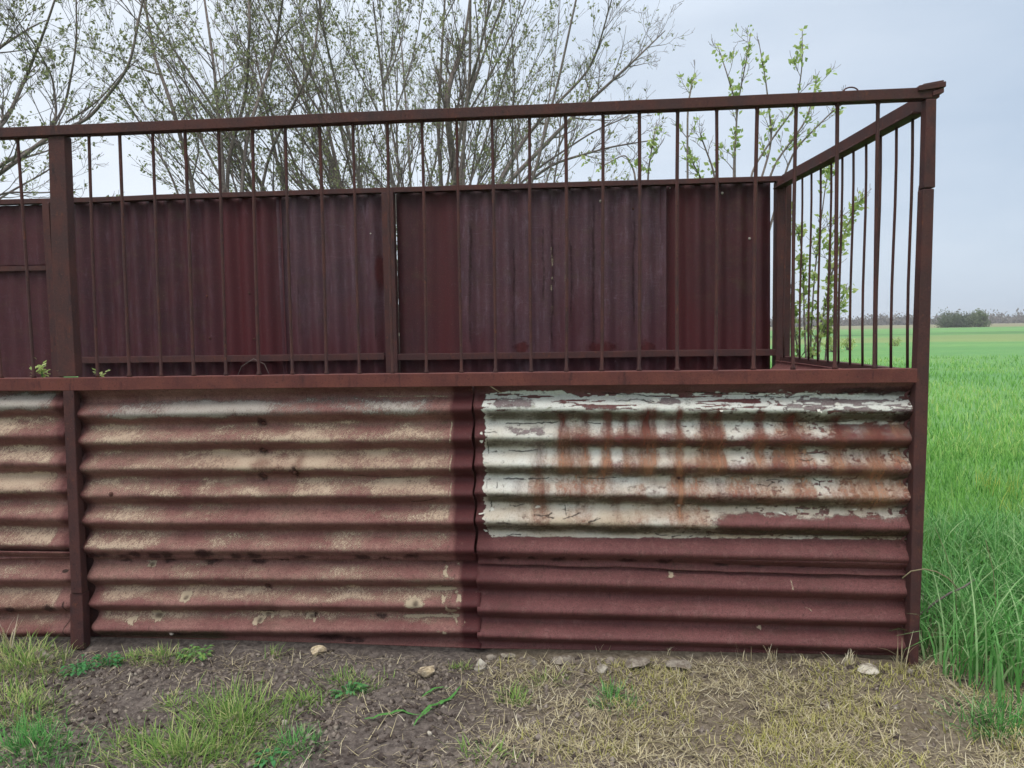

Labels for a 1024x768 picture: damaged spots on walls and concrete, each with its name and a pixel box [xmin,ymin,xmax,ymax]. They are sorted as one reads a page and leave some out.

peeling [479,390,912,540]
rust [530,409,911,529]